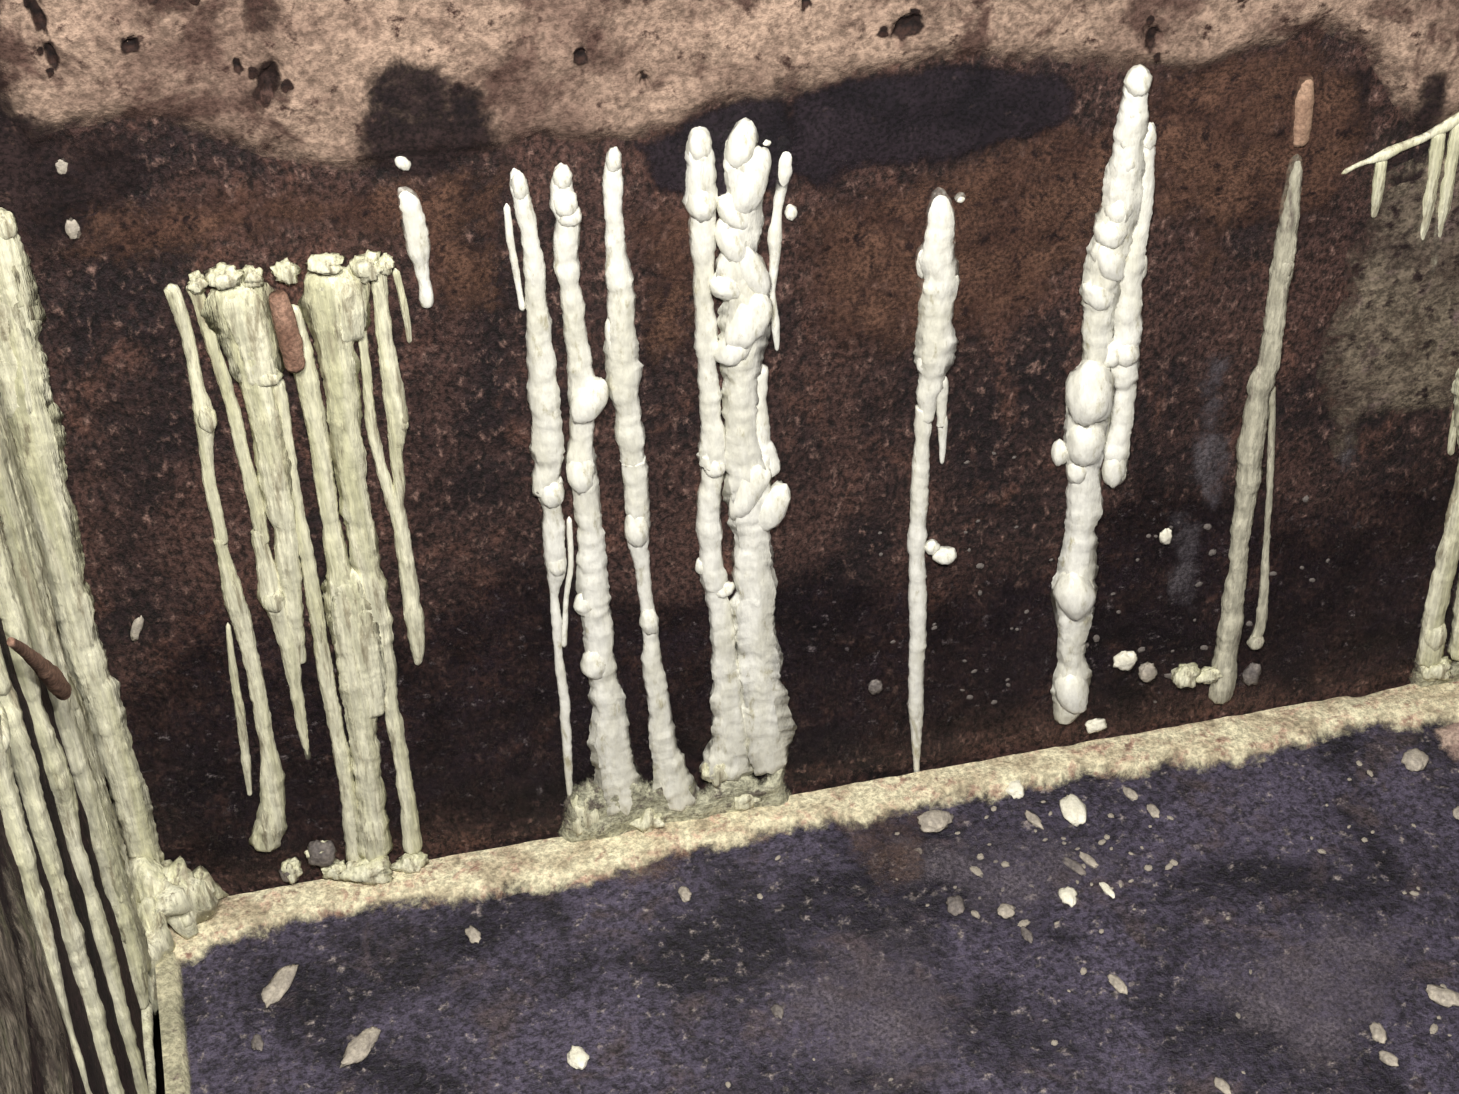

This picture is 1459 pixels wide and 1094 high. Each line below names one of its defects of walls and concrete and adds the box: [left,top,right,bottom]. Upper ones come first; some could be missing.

leakage [723,140,746,196]
corrosion [1148,51,1361,273]
leakage [1340,68,1372,138]
leakage [1371,73,1459,240]
leakage [0,233,261,907]
leakage [155,162,1459,1094]
leakage [0,646,156,1094]